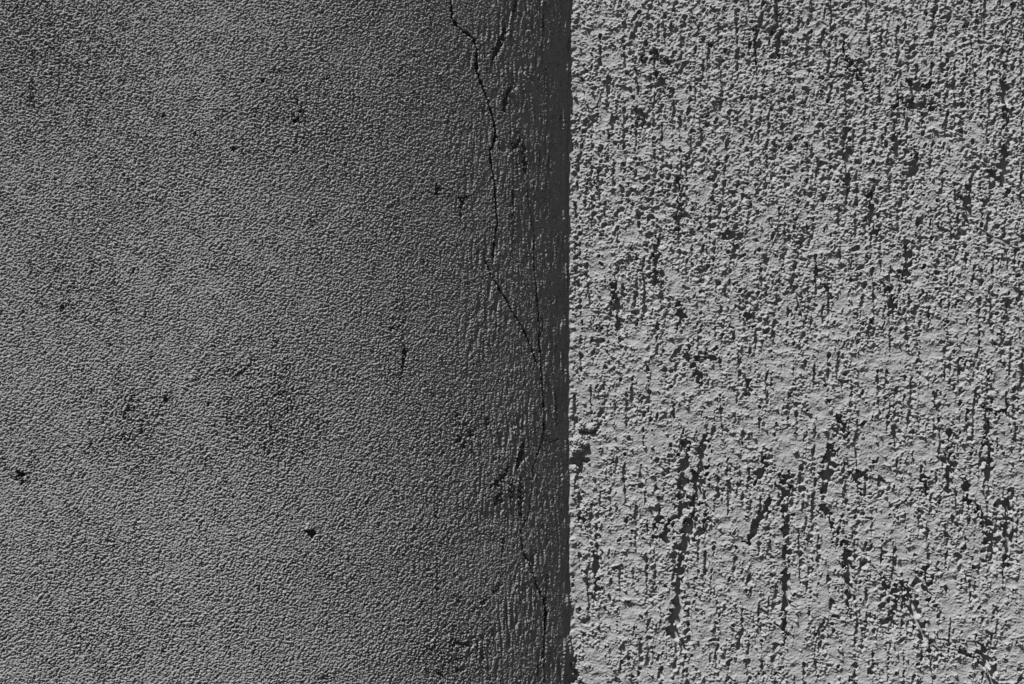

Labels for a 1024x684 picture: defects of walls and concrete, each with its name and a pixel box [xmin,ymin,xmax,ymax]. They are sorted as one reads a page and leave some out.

crack [450,0,555,683]